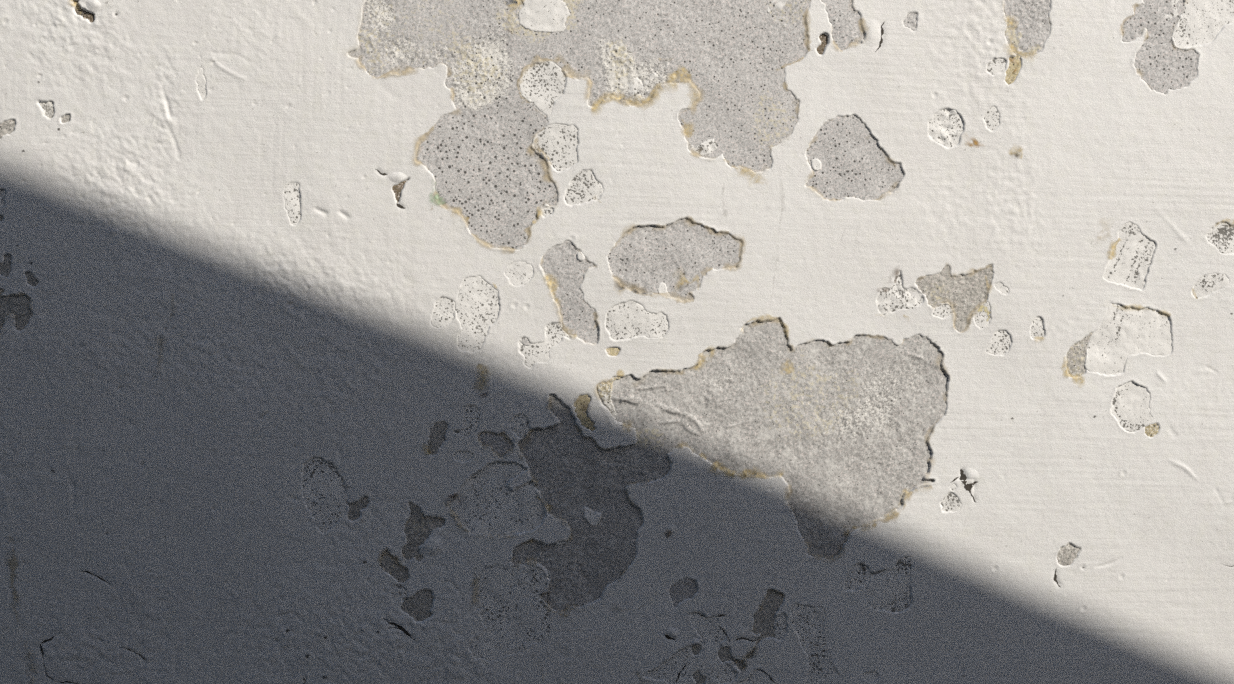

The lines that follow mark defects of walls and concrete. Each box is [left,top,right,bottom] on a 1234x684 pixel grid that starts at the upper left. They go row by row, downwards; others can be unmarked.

peeling [1004,0,1051,85]
peeling [1121,0,1199,94]
peeling [348,0,865,252]
peeling [806,115,904,200]
peeling [0,254,39,331]
peeling [540,218,744,356]
peeling [915,265,994,332]
peeling [478,316,948,616]
flaking render [346,497,369,521]
peeling [718,589,787,670]